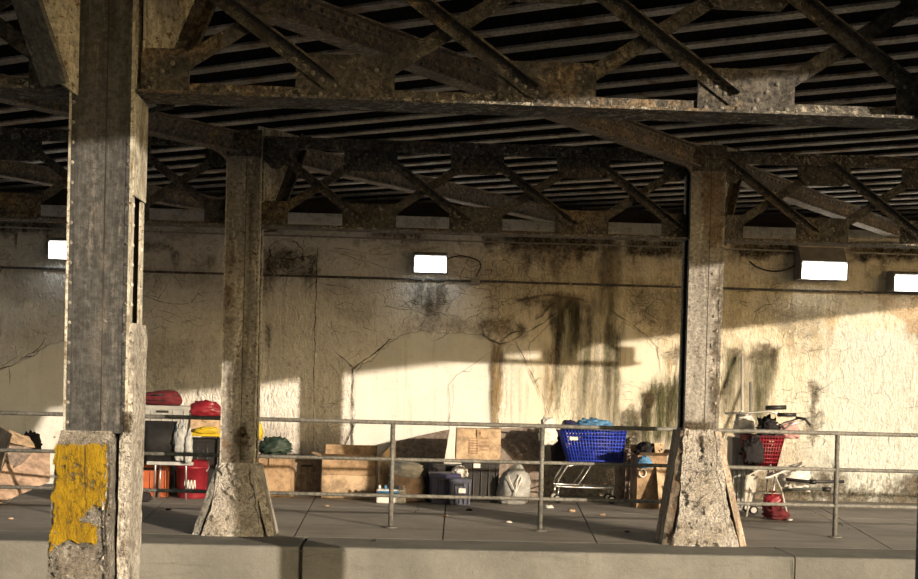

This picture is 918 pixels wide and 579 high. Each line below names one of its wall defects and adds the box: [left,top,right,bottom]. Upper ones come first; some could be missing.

crack [0,330,45,383]
crack [263,237,582,445]
water stain [479,230,679,443]
water stain [723,348,777,414]
peeling [47,436,114,577]